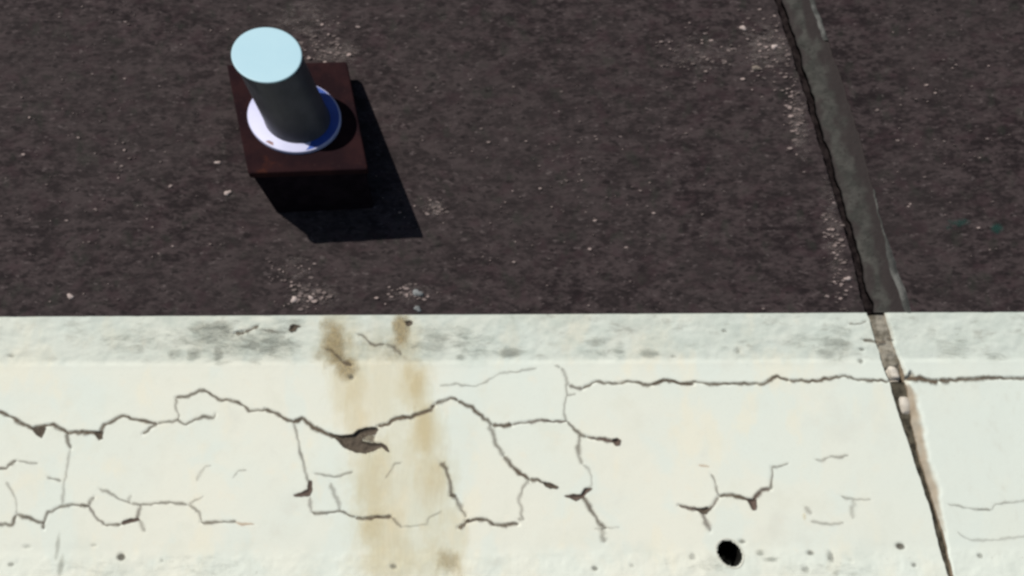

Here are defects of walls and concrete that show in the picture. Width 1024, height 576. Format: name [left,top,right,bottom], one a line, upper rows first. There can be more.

corrosion [325,327,353,375]
crack [570,375,1024,389]
crack [0,389,334,448]
crack [378,397,614,442]
spalling [329,427,389,454]
crack [0,502,243,529]
crack [312,510,391,520]
crack [440,463,456,498]
crack [458,518,518,529]
crack [504,457,546,483]
crack [583,492,606,528]
crack [679,473,773,517]